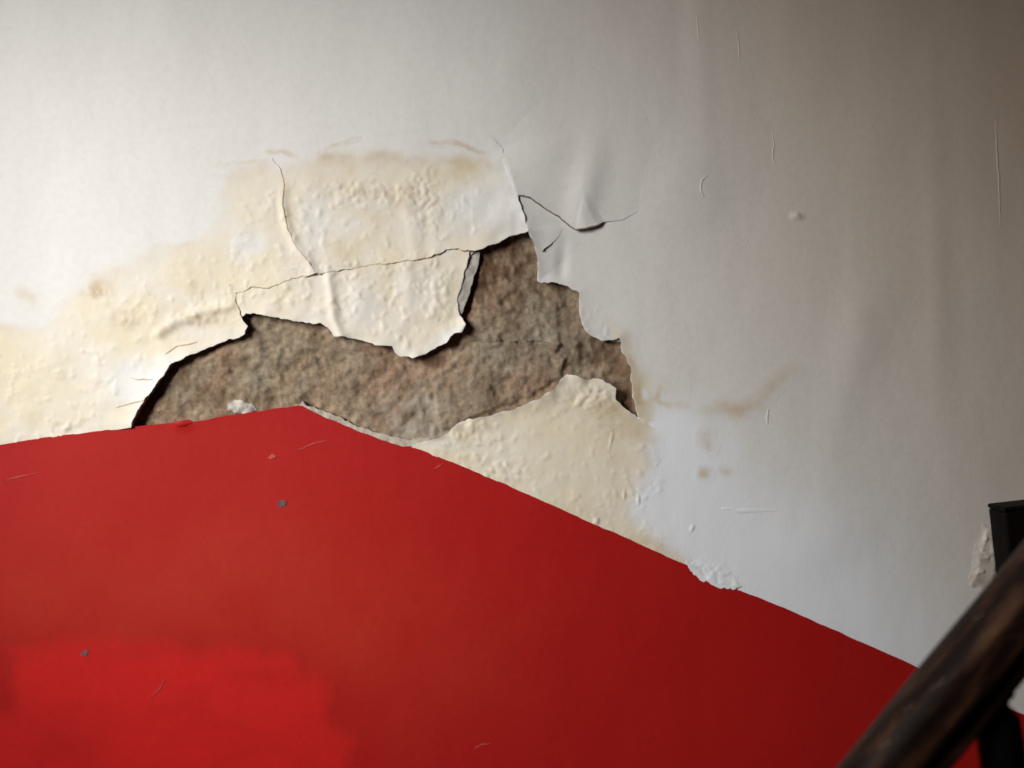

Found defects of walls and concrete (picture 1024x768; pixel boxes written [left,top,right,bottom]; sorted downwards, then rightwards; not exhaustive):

leakage [0,135,520,445]
crack [234,161,476,316]
spalling [0,91,744,590]
leakage [412,312,805,565]